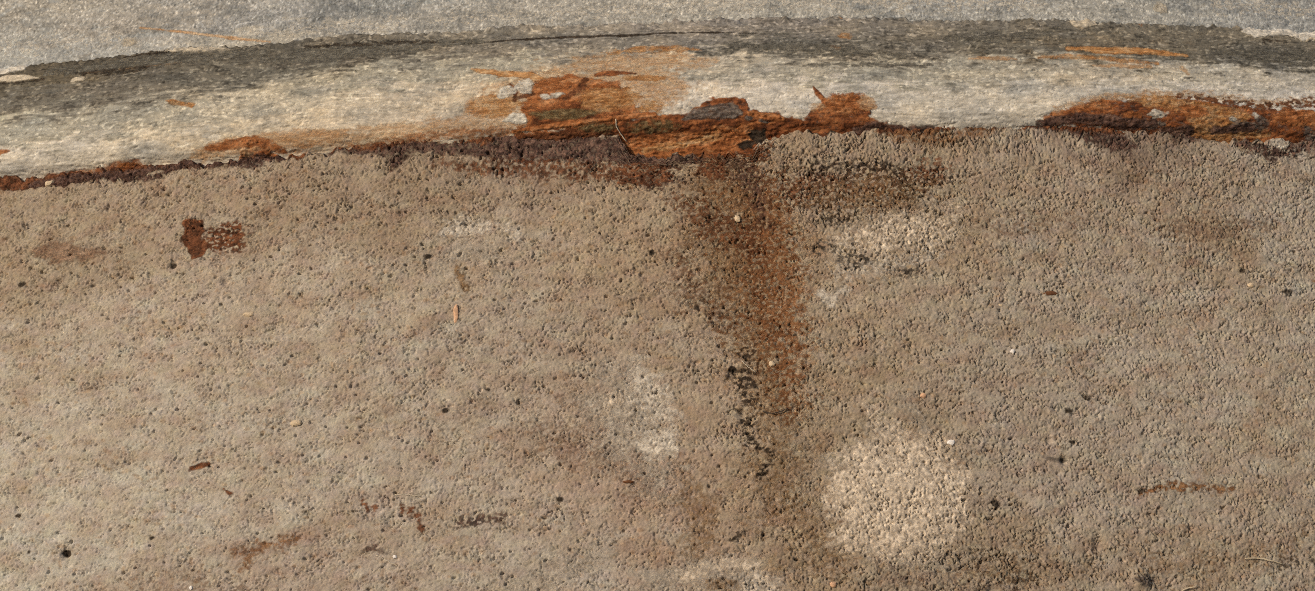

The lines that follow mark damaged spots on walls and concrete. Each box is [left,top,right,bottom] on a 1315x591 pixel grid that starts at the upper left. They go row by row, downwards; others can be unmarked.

rust [1038,46,1189,75]
rust [1175,93,1315,111]
rust [1020,125,1137,160]
rust [1235,139,1315,161]
rust [0,45,1004,514]
efflorescence [819,393,984,570]
rust [400,504,425,533]
rust [457,513,507,527]